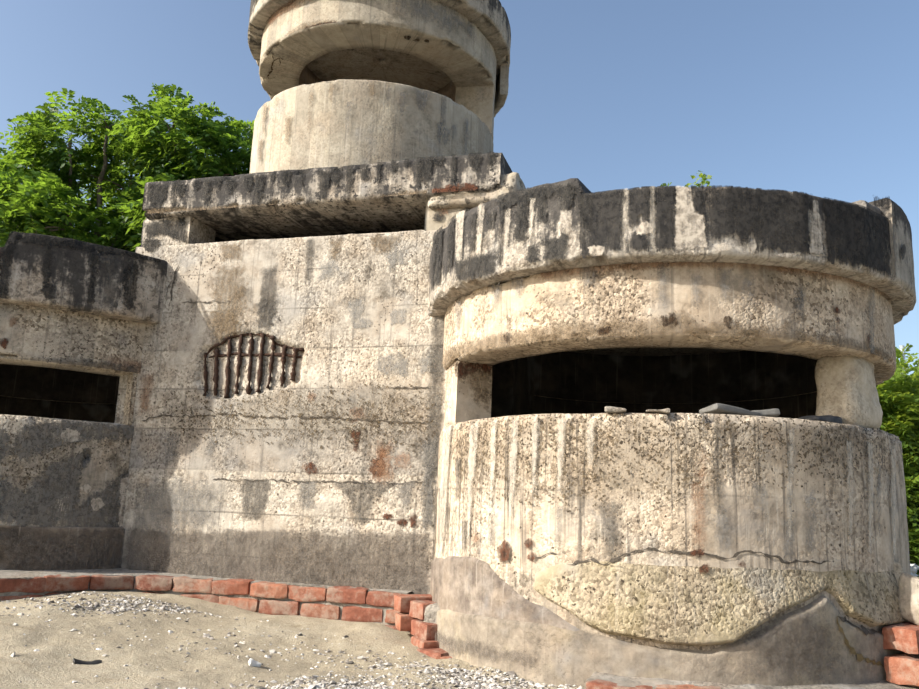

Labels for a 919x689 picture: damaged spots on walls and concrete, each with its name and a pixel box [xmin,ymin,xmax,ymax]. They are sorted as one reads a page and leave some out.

damp [318,155,456,199]
damp [0,169,304,310]
damp [206,244,248,338]
damp [258,268,276,330]
damp [306,239,314,279]
damp [431,184,593,299]
damp [874,197,906,269]
damp [0,310,889,594]
damp [868,443,896,555]
corrosion [497,540,510,562]
crack [536,547,831,569]
flaking render [430,556,904,688]